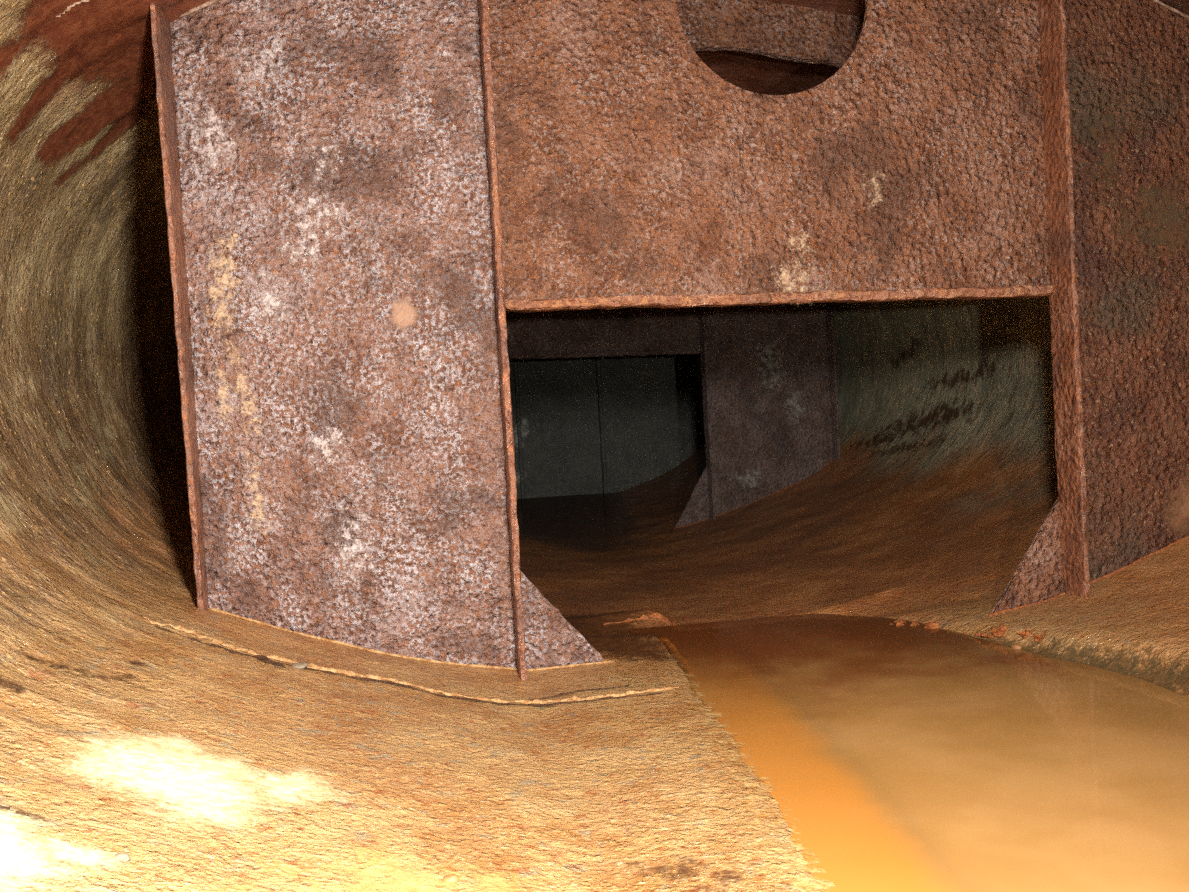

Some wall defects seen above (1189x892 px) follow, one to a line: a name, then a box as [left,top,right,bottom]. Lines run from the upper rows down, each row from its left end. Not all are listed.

rust [0,0,210,187]
rust [771,234,815,293]